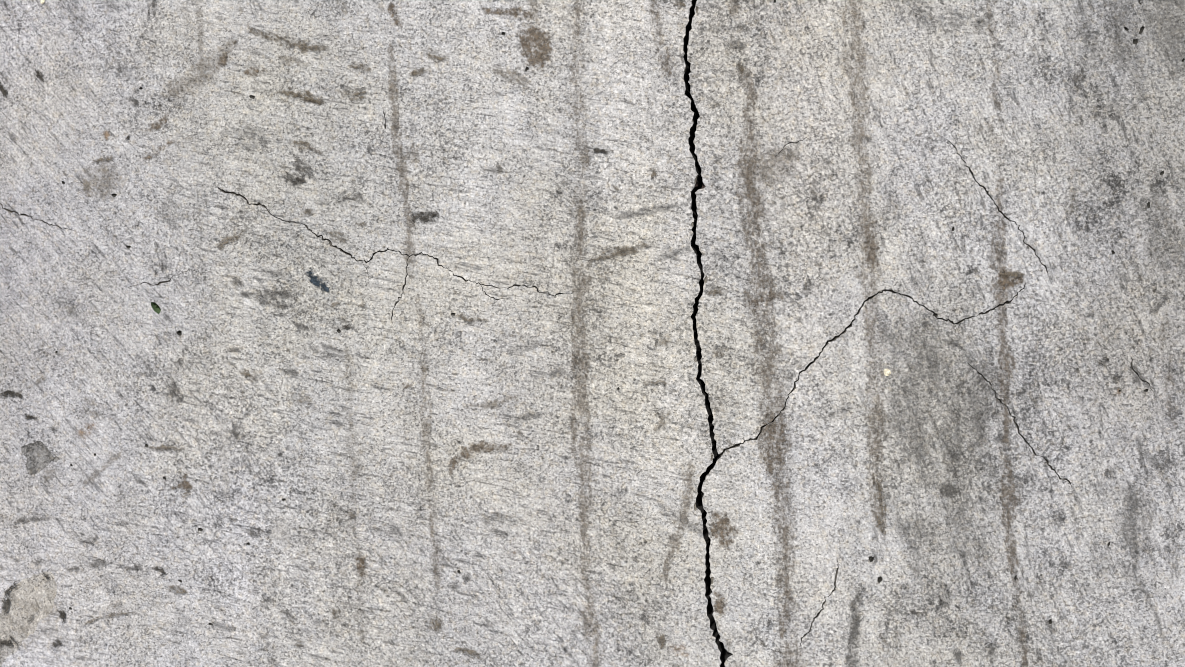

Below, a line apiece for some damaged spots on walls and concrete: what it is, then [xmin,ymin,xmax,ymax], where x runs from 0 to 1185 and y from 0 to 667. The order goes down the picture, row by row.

crack [0,203,76,232]
crack [213,186,575,324]
crack [683,0,1048,667]